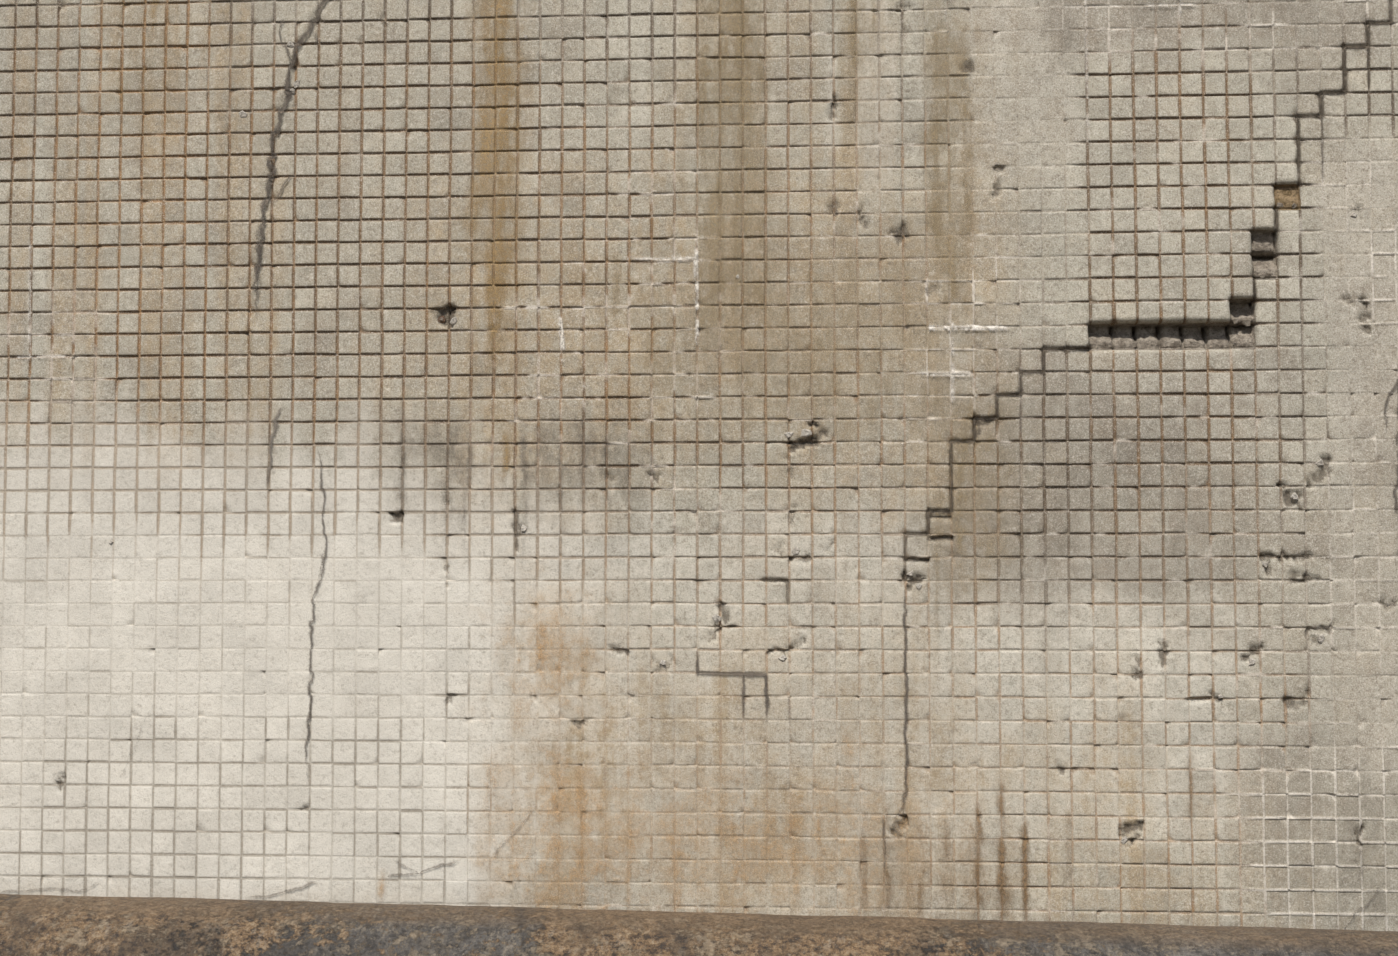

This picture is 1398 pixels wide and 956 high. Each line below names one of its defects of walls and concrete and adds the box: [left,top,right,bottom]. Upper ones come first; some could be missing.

crack [239,0,327,304]
rust [471,0,519,334]
peeling [1088,300,1256,350]
peeling [1250,231,1278,280]
peeling [1273,184,1301,210]
crack [1296,0,1393,173]
spalling [784,422,828,452]
crack [904,346,1089,558]
crack [1384,379,1398,510]
crack [304,460,327,759]
spalling [1260,551,1319,583]
crack [883,600,909,864]